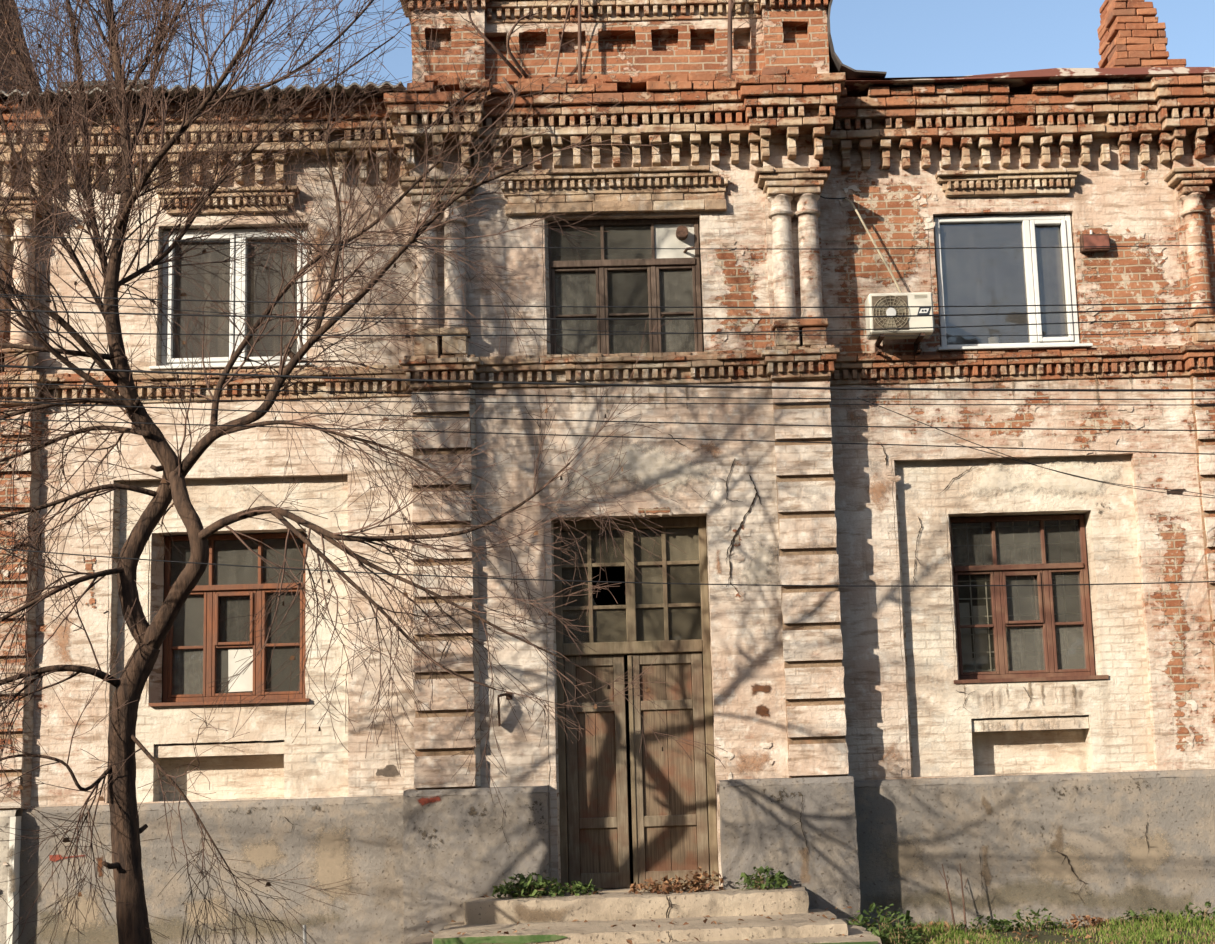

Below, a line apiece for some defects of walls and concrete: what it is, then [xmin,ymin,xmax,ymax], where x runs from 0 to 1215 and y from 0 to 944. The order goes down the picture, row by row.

peeling [714,239,760,341]
peeling [835,179,938,329]
peeling [1078,221,1178,333]
peeling [0,423,21,479]
peeling [0,530,25,578]
crack [686,459,762,592]
peeling [1150,523,1201,755]
crack [1056,851,1087,901]